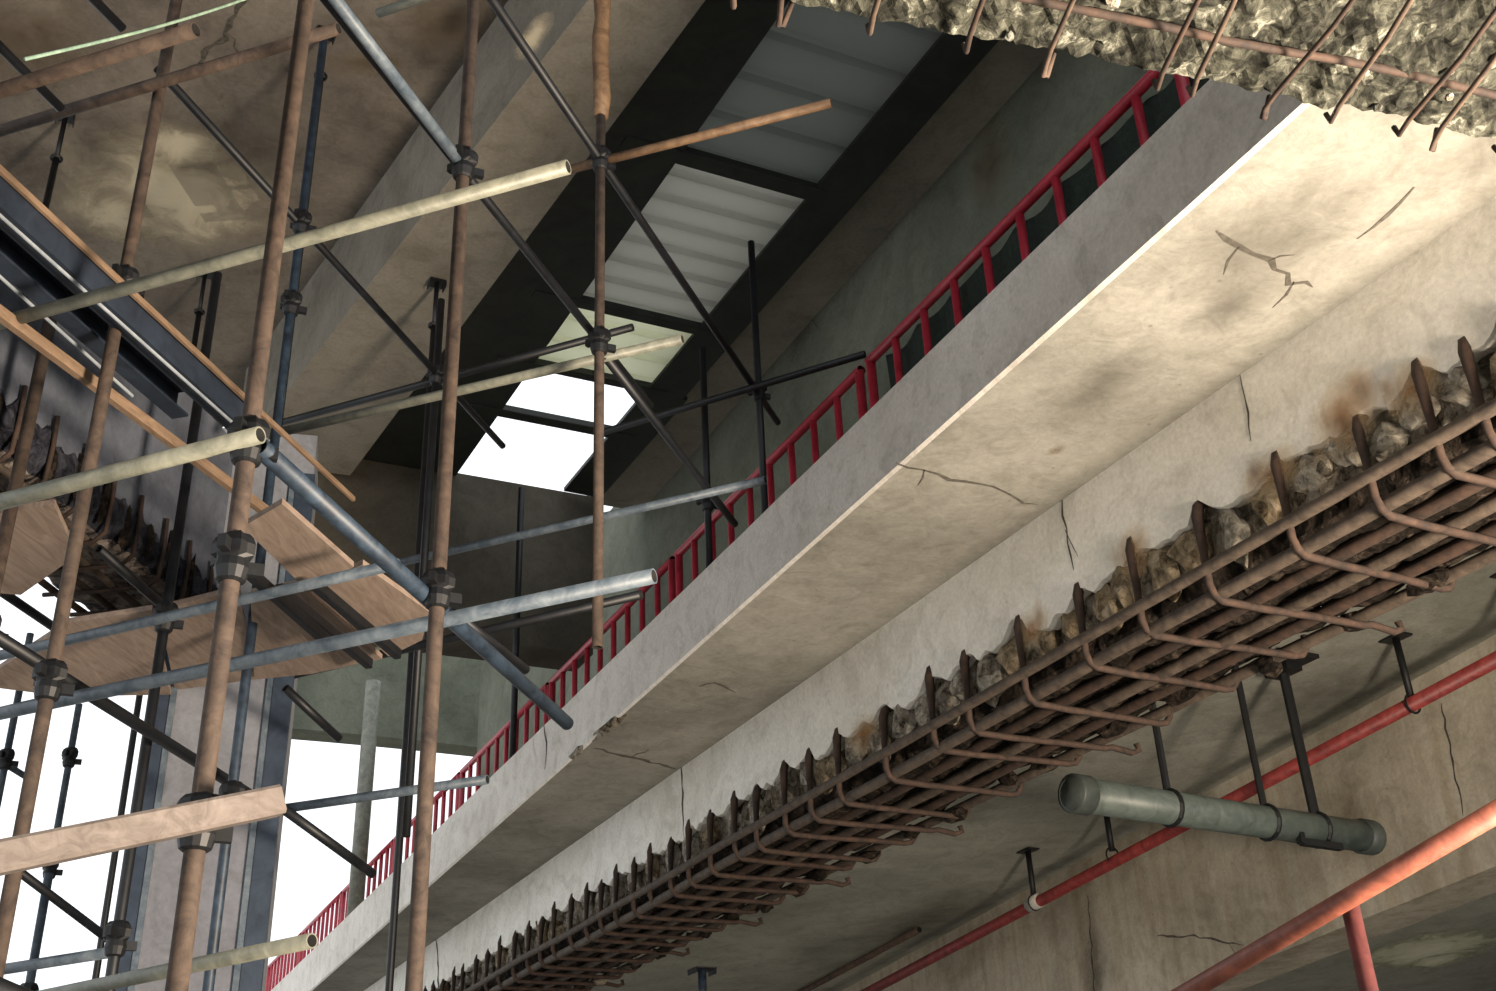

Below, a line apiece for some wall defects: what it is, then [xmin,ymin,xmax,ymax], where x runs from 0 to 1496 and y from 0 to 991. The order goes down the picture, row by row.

peeling [524,21,546,50]
spalling [790,0,1496,138]
crack [1216,230,1313,307]
crack [896,462,1078,570]
spalling [435,352,1496,991]